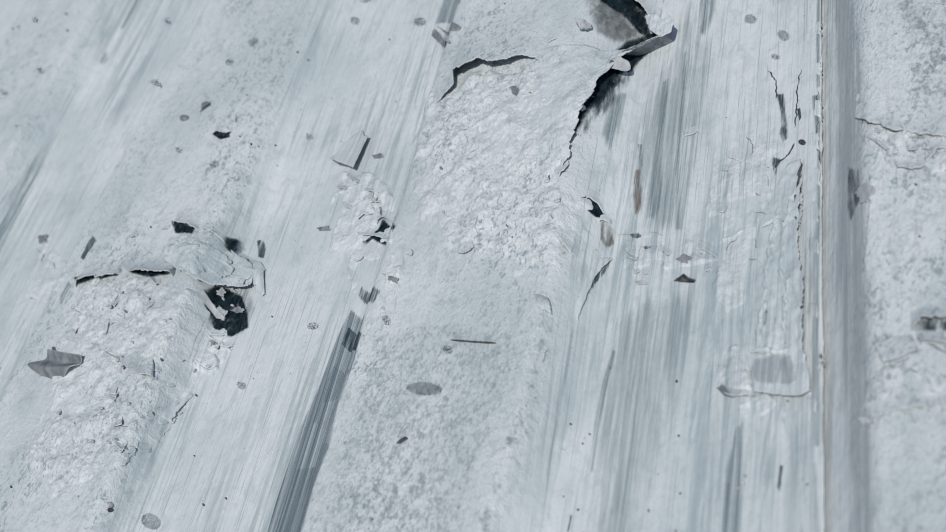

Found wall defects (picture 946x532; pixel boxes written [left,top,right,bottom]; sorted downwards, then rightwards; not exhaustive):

peeling [25,205,266,498]
peeling [317,130,398,293]
peeling [616,131,821,417]
peeling [836,0,946,532]